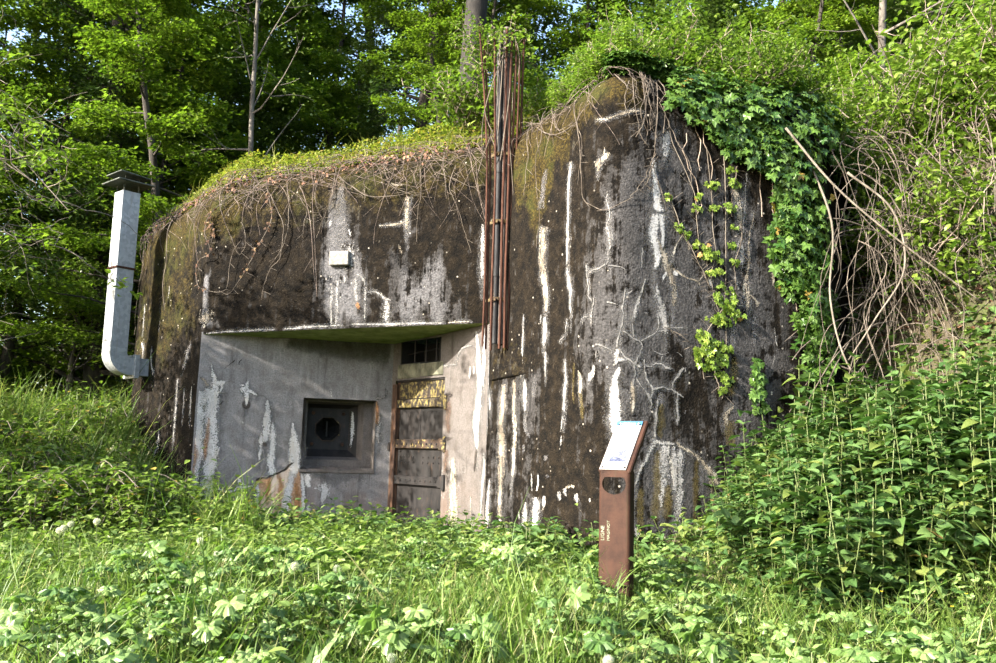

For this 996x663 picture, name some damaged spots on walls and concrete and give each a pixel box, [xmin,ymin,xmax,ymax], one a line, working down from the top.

leakage [206,276,527,533]
leakage [538,227,548,375]
crack [595,148,609,171]
leakage [609,367,636,432]
crack [559,194,719,485]
leakage [648,130,678,334]